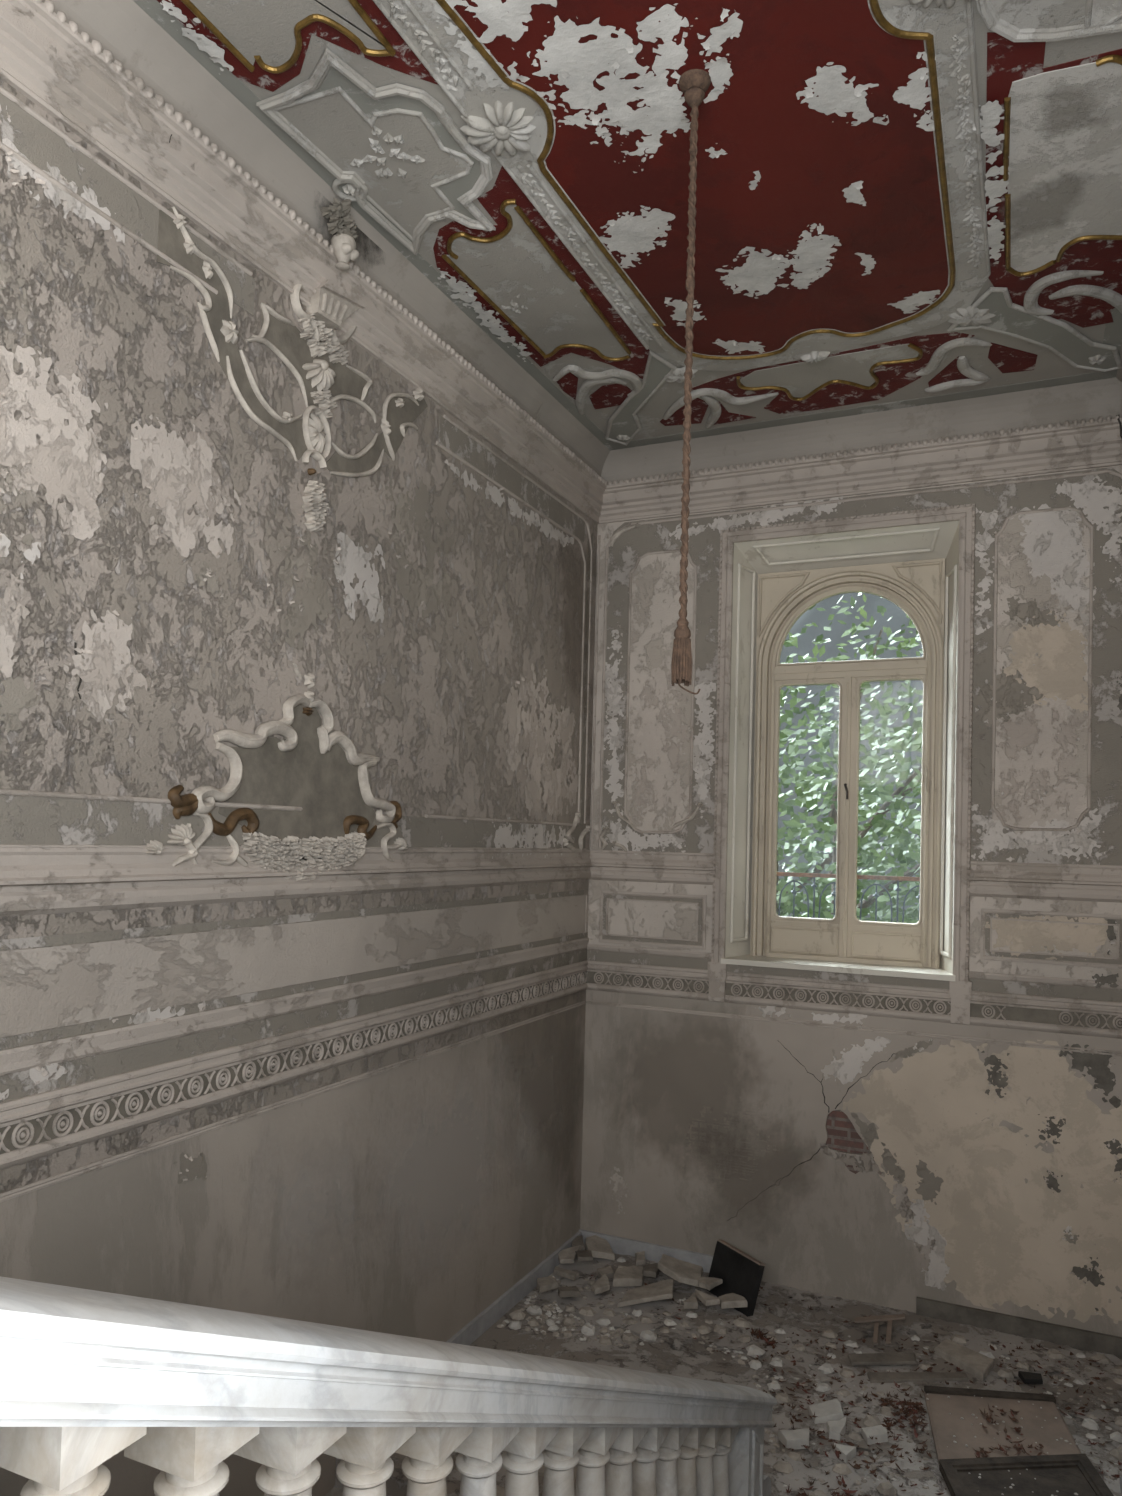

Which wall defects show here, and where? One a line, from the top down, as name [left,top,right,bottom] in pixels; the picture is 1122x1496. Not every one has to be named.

peeling [429,0,743,173]
peeling [796,52,943,131]
peeling [599,205,675,268]
peeling [715,223,876,299]
peeling [842,181,867,206]
peeling [972,100,1010,264]
peeling [0,345,108,687]
peeling [130,415,241,559]
peeling [975,475,1122,635]
peeling [63,609,156,724]
crack [777,1040,895,1113]
peeling [811,1012,1122,1324]